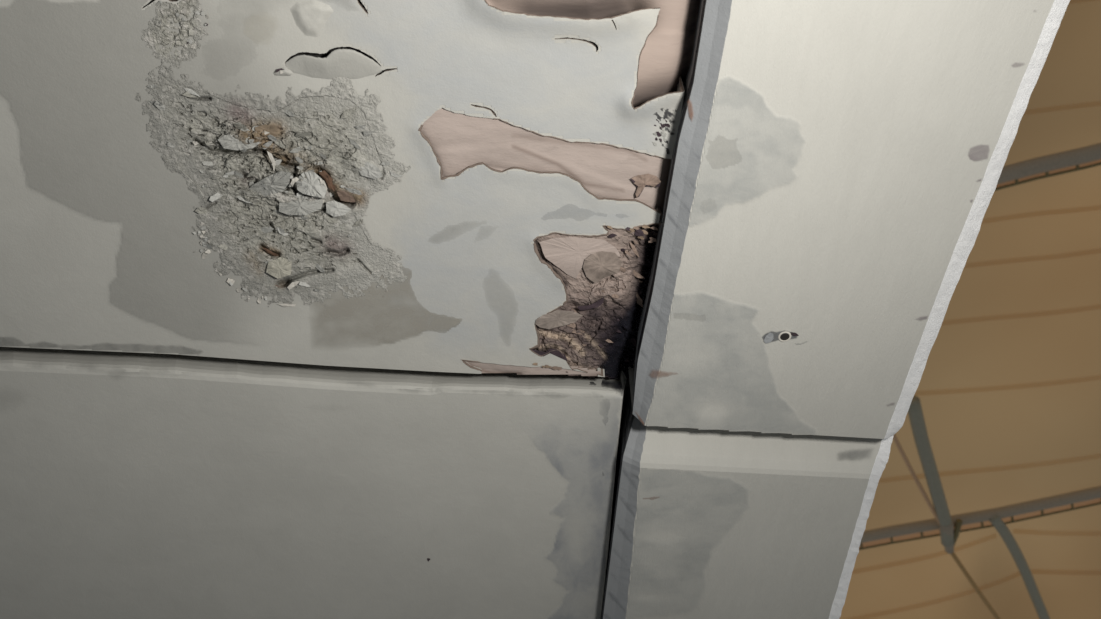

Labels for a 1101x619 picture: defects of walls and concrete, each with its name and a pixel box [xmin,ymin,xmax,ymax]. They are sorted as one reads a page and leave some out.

leakage [0,0,460,347]
spalling [135,0,411,307]
peeling [418,108,671,378]
peeling [485,0,700,109]